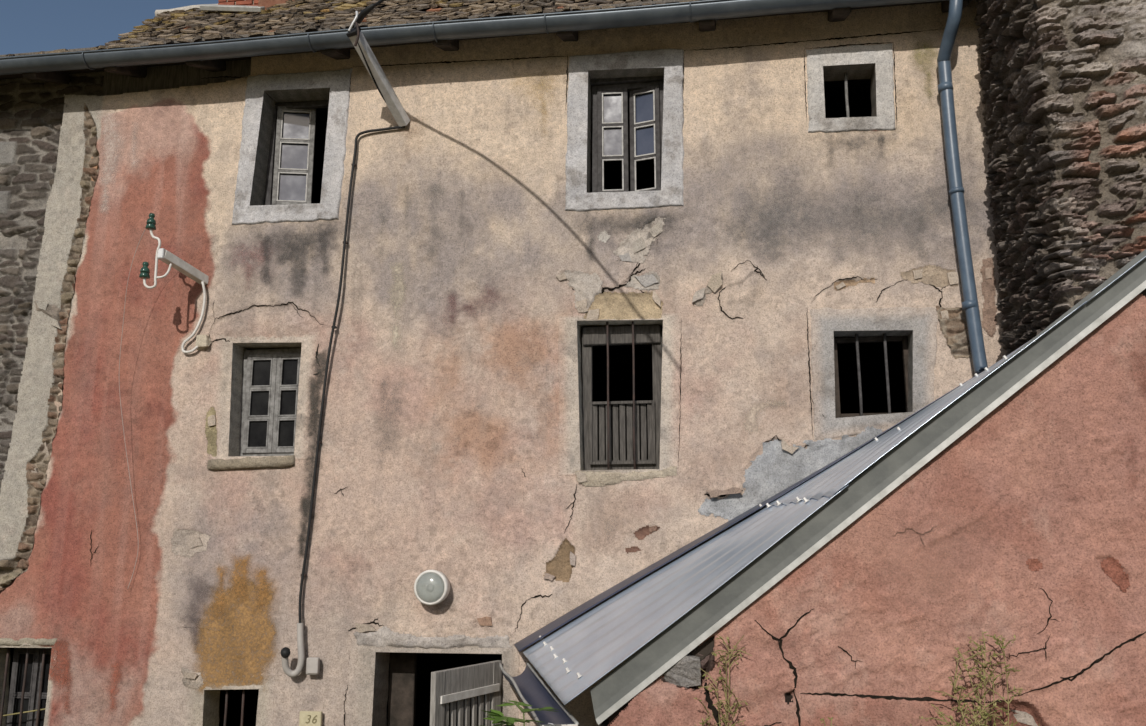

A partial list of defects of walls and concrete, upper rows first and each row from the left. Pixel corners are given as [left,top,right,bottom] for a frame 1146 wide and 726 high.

damp [253,224,333,293]
flaking render [555,217,666,321]
crack [718,260,765,319]
crack [209,300,323,375]
crack [765,276,946,448]
flaking render [698,426,882,521]
flaking render [543,538,576,582]
flaking render [1101,557,1130,592]
crack [515,594,552,629]
crack [755,588,1146,726]
crack [702,676,721,726]
flaking render [989,699,1049,726]